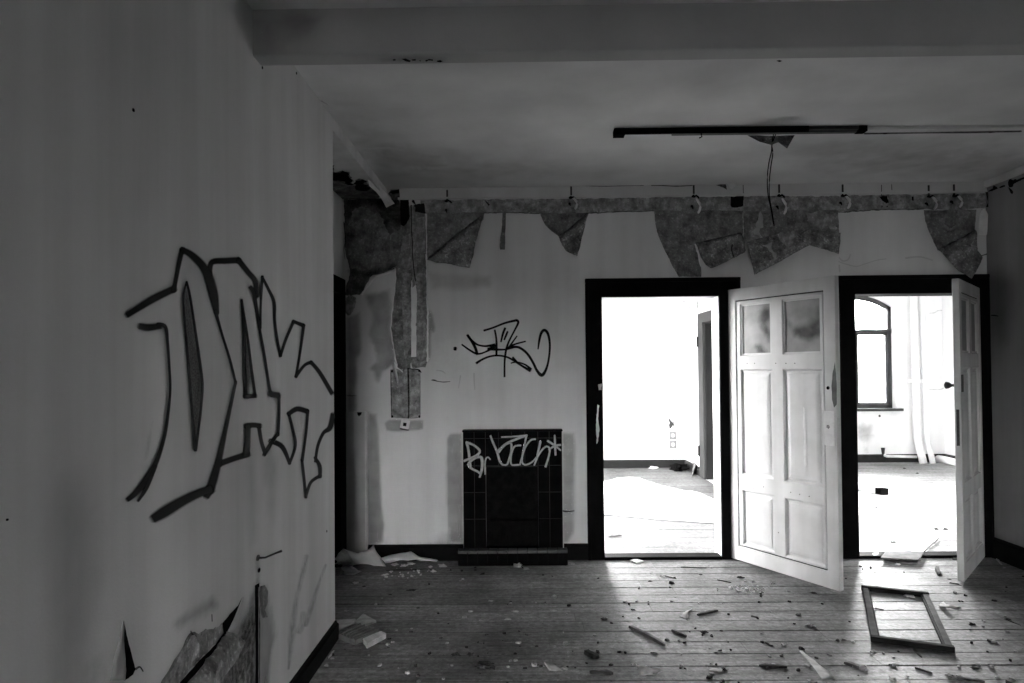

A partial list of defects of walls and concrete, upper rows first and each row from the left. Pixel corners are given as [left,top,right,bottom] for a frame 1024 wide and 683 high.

peeling [333,165,988,419]
spalling [124,624,136,680]
flaking render [161,623,224,683]
spalling [225,583,268,683]